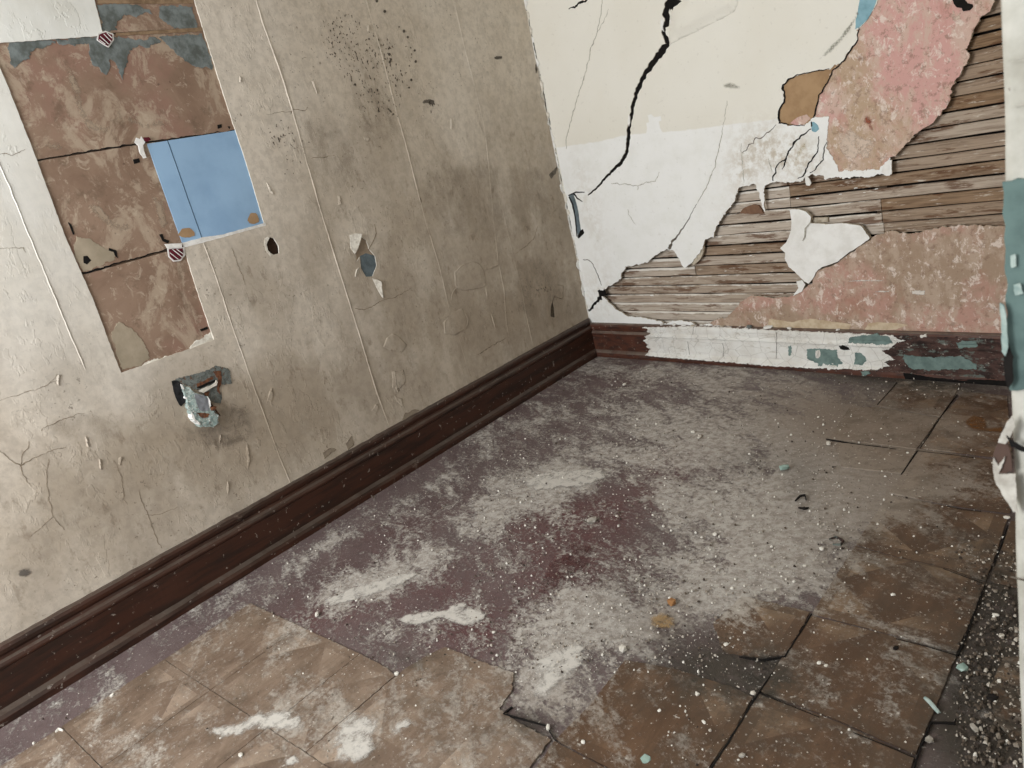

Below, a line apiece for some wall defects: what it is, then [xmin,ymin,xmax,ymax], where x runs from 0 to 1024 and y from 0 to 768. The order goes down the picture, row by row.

leakage [323,13,417,117]
crack [566,0,609,149]
crack [588,0,681,224]
peeling [0,0,235,373]
peeling [247,213,259,224]
spalling [264,237,278,256]
peeling [350,224,383,298]
crack [583,259,607,311]
crack [668,106,827,250]
flaking render [605,0,1023,380]
spalling [172,381,200,425]